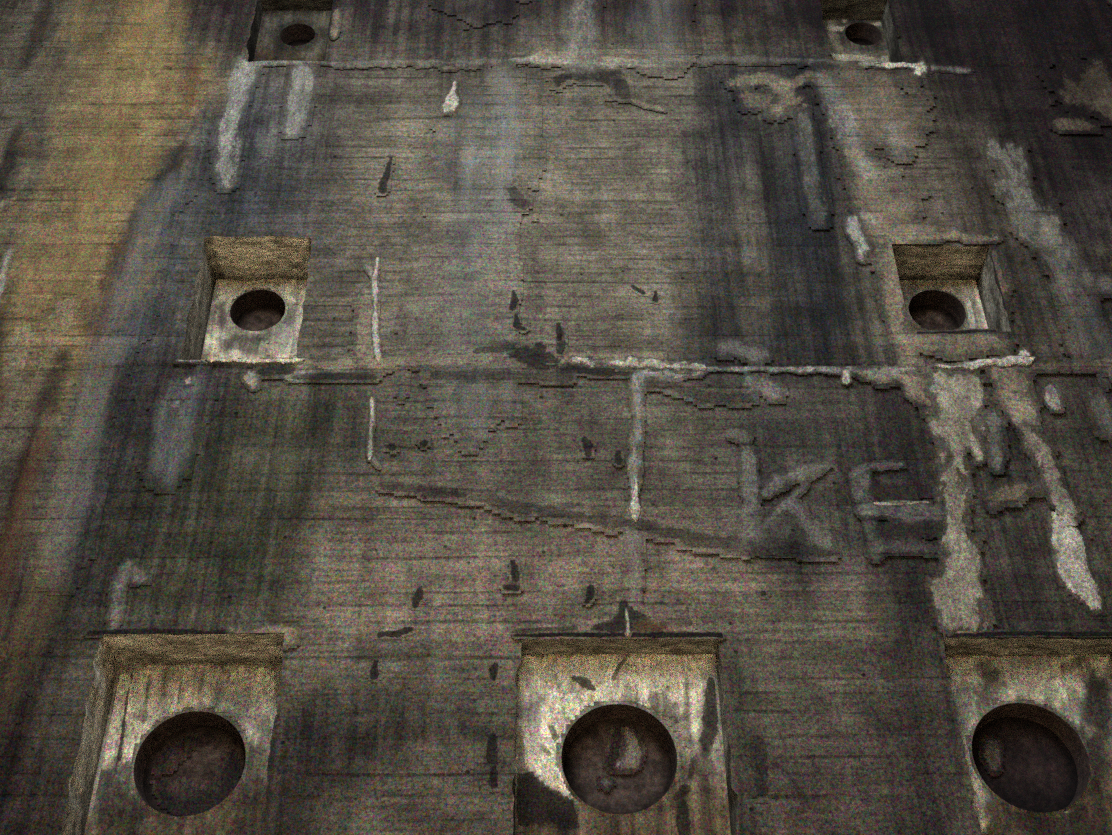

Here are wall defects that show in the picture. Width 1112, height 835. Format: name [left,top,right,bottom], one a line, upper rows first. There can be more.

rust [0,0,226,756]
water stain [24,0,1112,638]